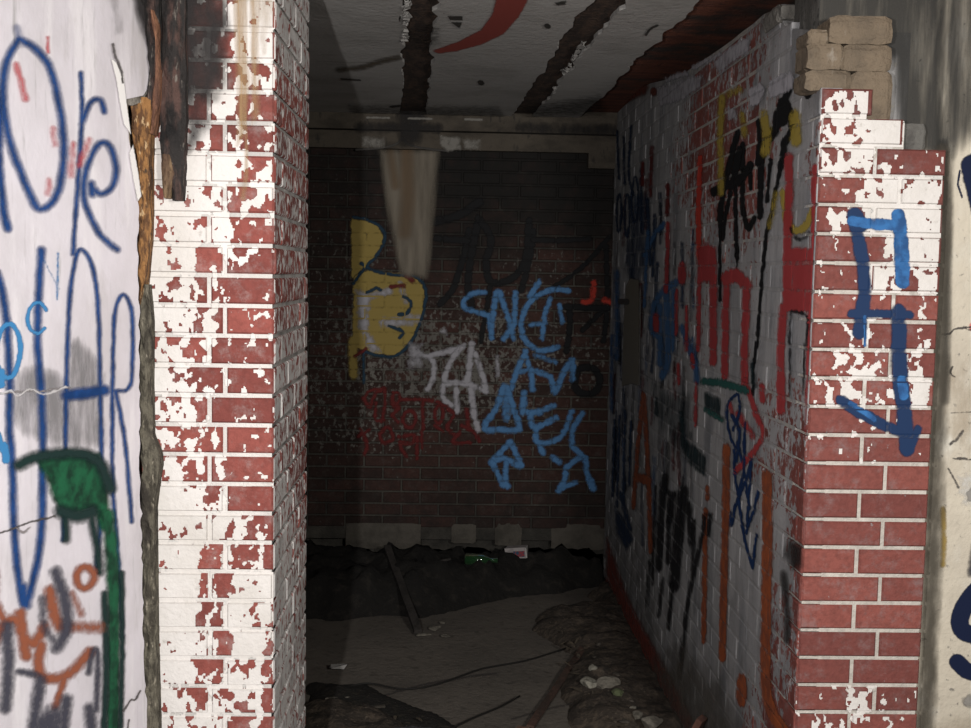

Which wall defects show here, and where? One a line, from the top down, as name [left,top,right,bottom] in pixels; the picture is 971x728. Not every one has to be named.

peeling [112,43,150,200]
corrosion [237,0,255,135]
peeling [656,39,749,106]
peeling [748,15,944,438]
peeling [150,0,275,728]
peeling [812,685,916,728]